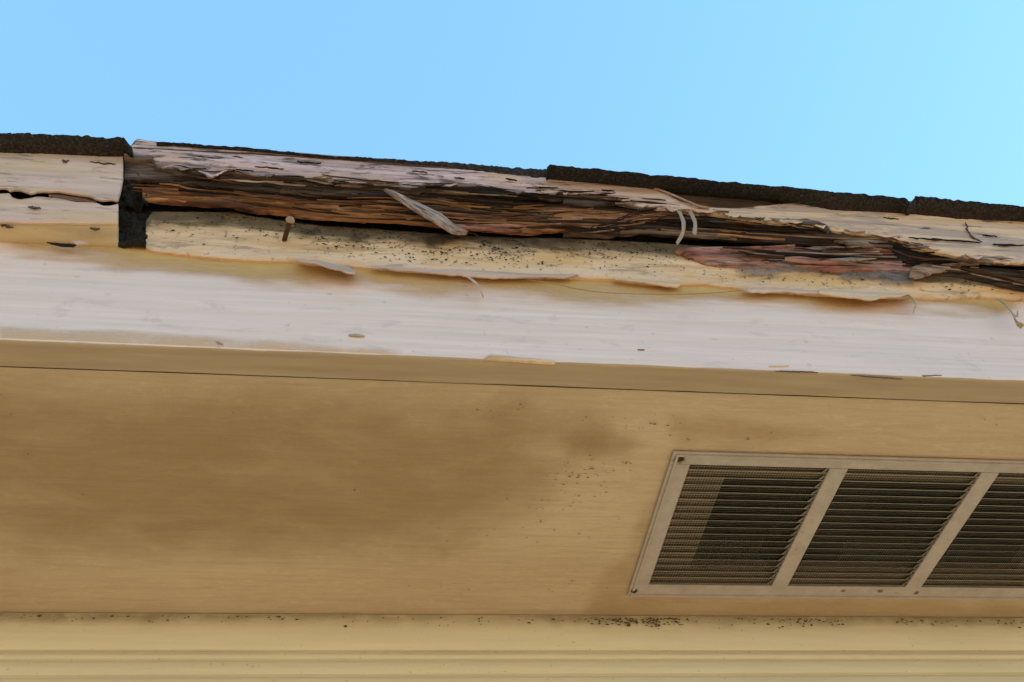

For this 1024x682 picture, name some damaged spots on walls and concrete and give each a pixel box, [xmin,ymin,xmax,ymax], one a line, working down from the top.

peeling [173,166,299,179]
peeling [540,191,630,201]
peeling [654,188,826,229]
peeling [297,259,355,275]
peeling [371,265,578,279]
leakage [73,211,1012,311]
peeling [675,247,912,274]
peeling [614,277,681,288]
peeling [742,287,909,301]
leakage [551,617,710,629]